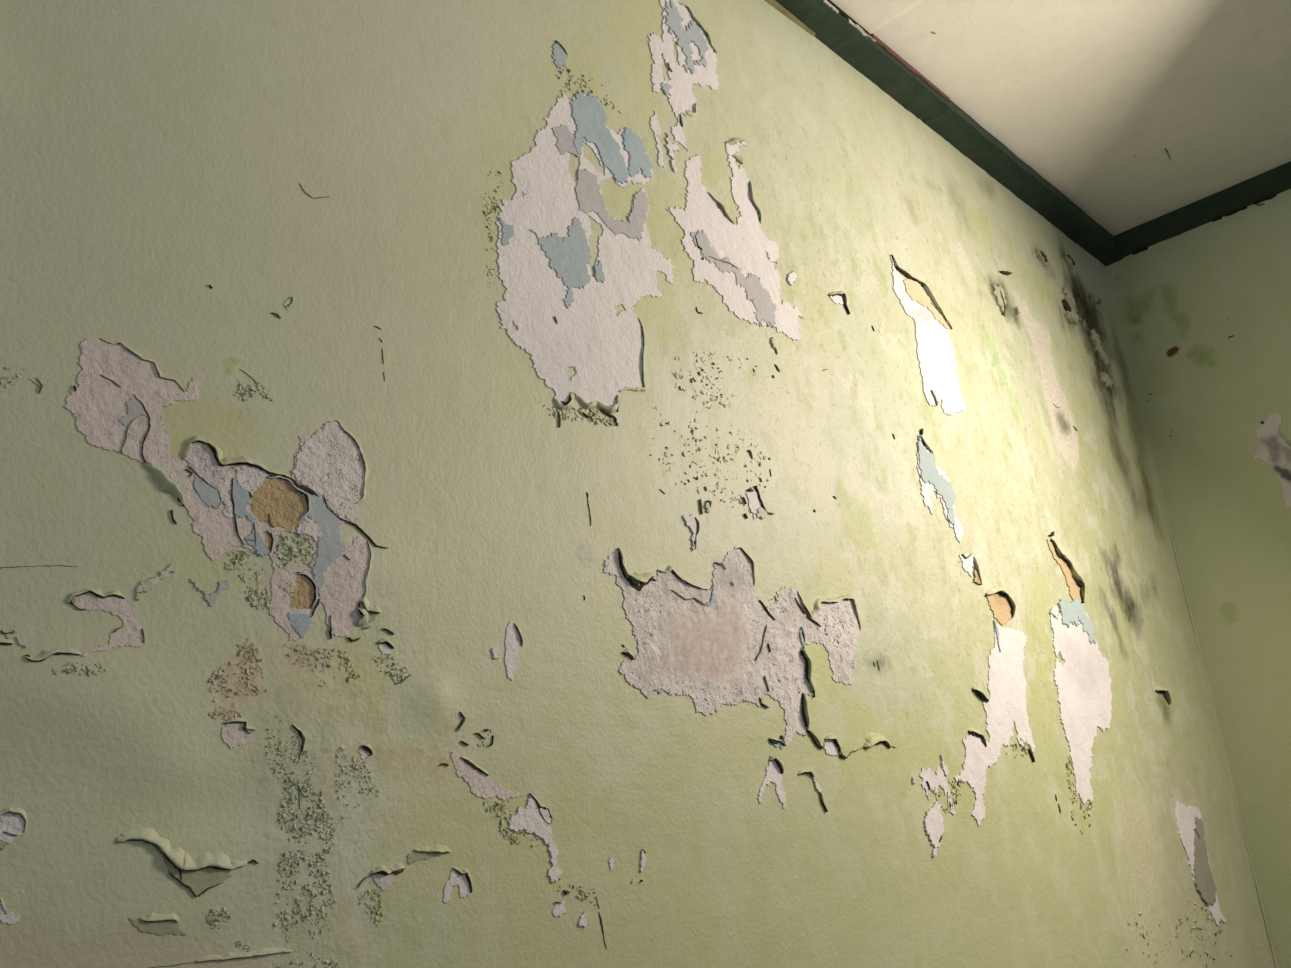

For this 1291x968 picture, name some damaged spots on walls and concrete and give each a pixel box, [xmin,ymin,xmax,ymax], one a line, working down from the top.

peeling [482,0,804,428]
peeling [890,254,966,416]
leakage [991,271,1078,468]
leakage [1035,248,1114,393]
peeling [115,828,258,897]
peeling [64,338,388,687]
peeling [206,636,380,968]
peeling [439,729,597,927]
peeling [603,546,861,809]
peeling [911,428,1036,857]
peeling [1049,597,1112,834]
leakage [1111,565,1135,617]